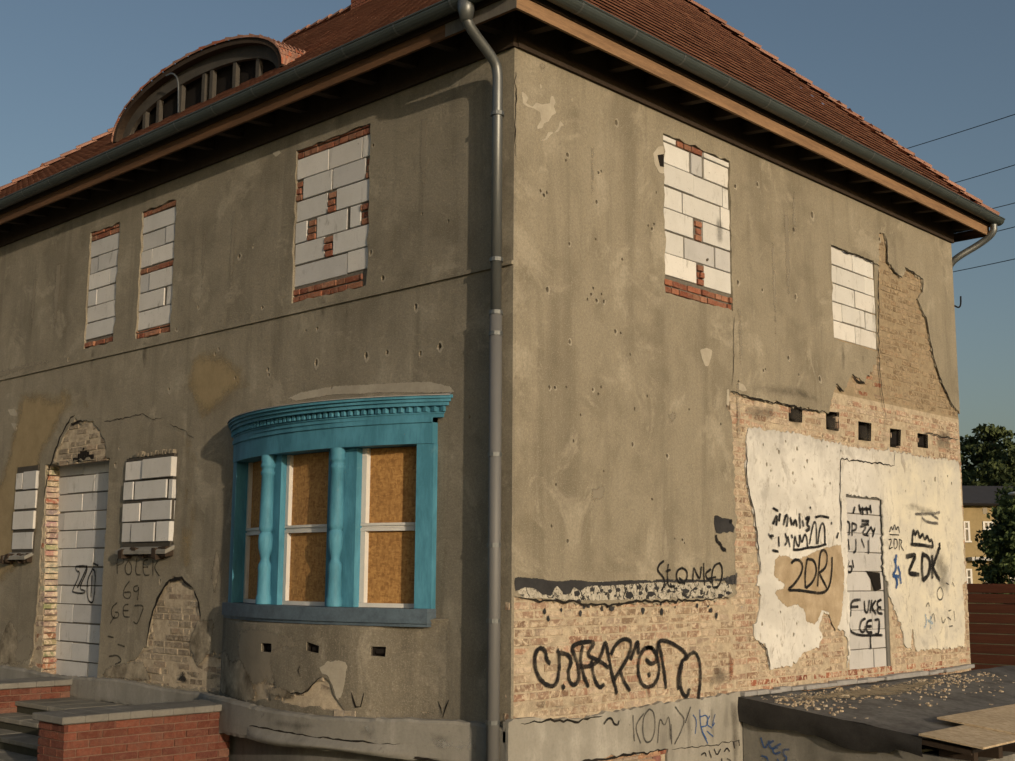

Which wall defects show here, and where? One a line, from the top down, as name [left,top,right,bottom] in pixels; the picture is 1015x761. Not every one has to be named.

peeling [0,393,69,579]
flaking render [55,419,118,469]
flaking render [504,233,971,720]
flaking render [104,576,356,717]